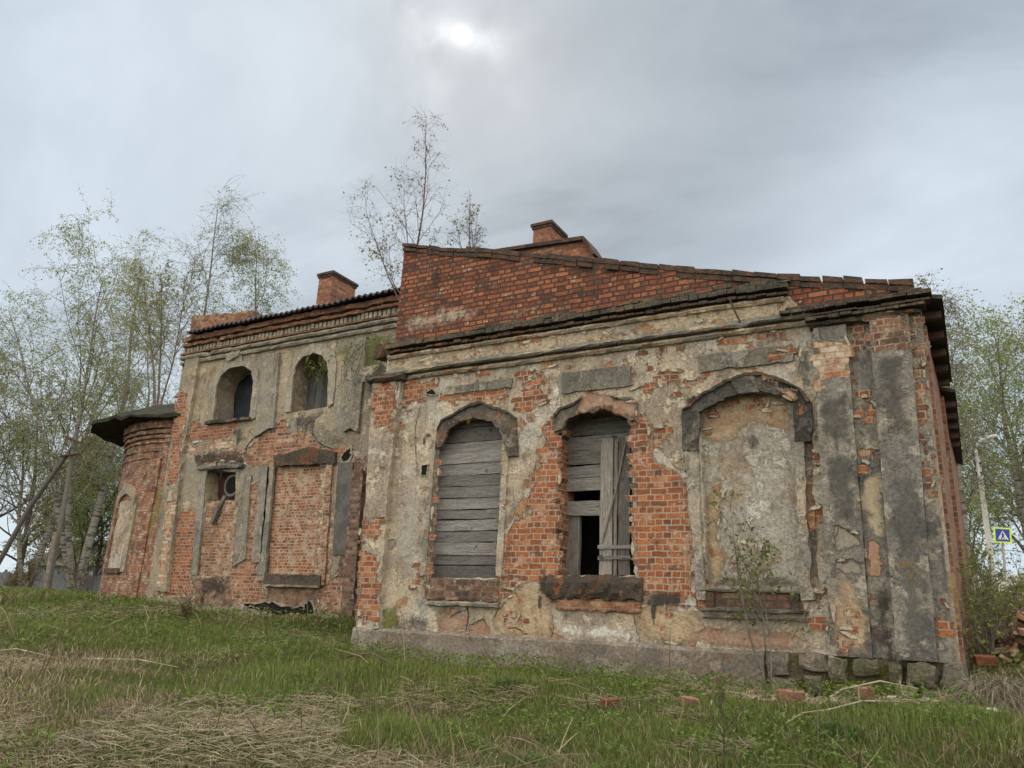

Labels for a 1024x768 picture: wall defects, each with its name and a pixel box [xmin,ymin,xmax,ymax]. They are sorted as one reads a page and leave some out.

spalling [156,390,397,625]
spalling [368,351,566,638]
spalling [578,344,886,656]
peeling [702,309,943,497]
leakage [821,394,853,518]
leakage [880,356,908,432]